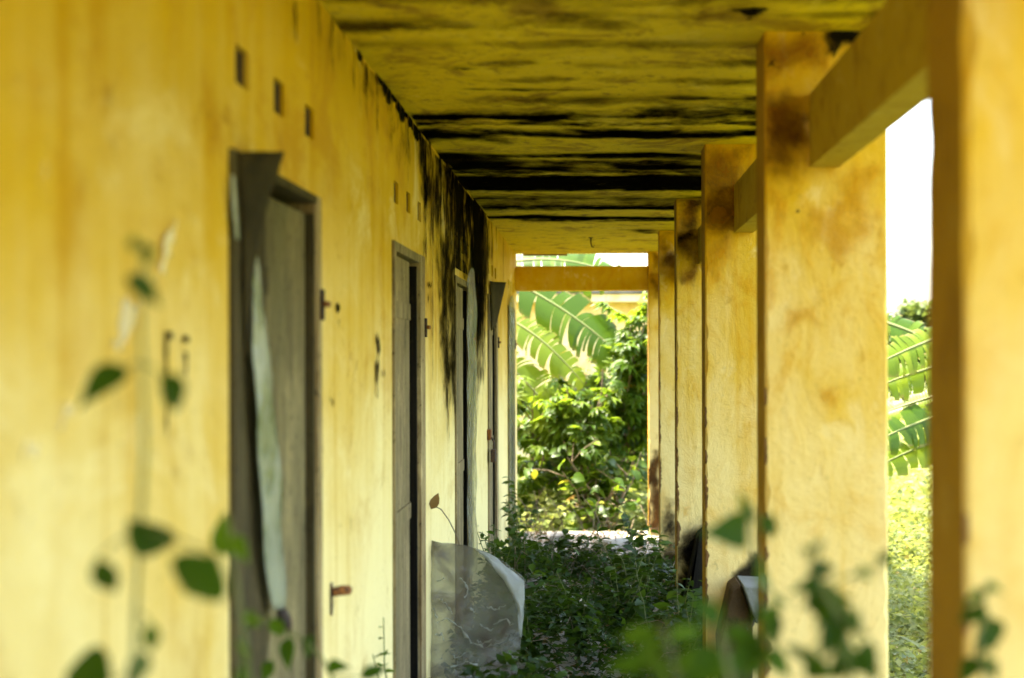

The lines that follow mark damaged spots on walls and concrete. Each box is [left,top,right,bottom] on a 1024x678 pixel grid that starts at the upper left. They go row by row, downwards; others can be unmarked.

damp [724,31,861,68]
damp [767,102,804,162]
damp [407,90,756,416]